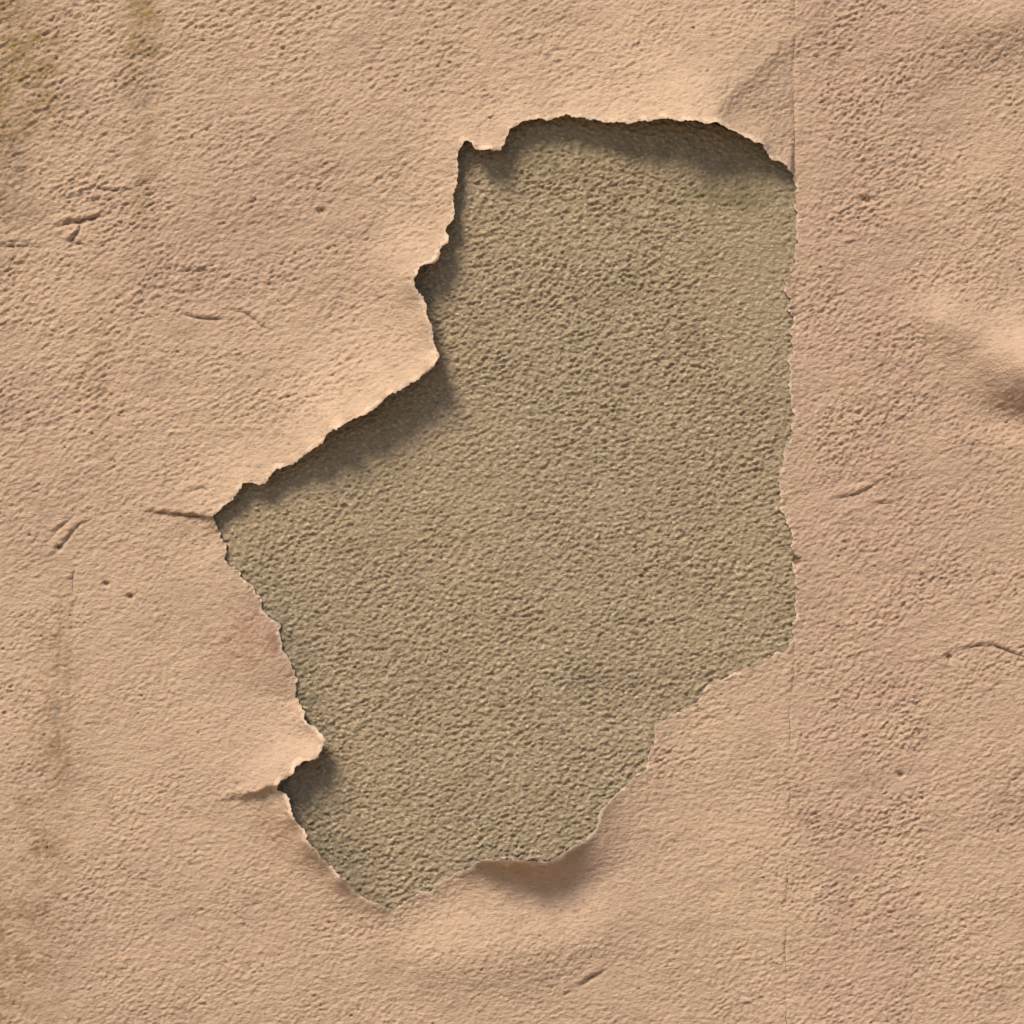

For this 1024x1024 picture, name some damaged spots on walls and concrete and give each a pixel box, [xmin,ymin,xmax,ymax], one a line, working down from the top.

peeling [119,53,801,950]
crack [958,645,1024,657]